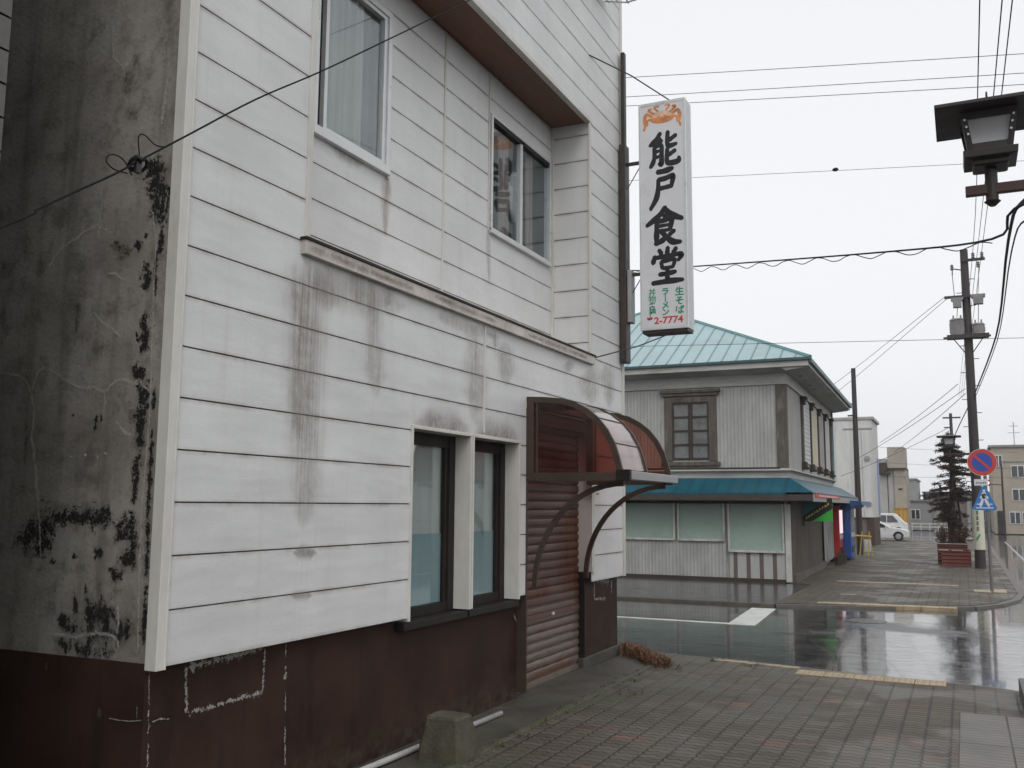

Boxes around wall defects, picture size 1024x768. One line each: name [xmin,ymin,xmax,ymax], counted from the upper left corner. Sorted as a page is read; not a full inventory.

crack [10,315,152,554]
damp [10,495,140,583]
damp [55,584,131,659]
crack [50,598,139,647]